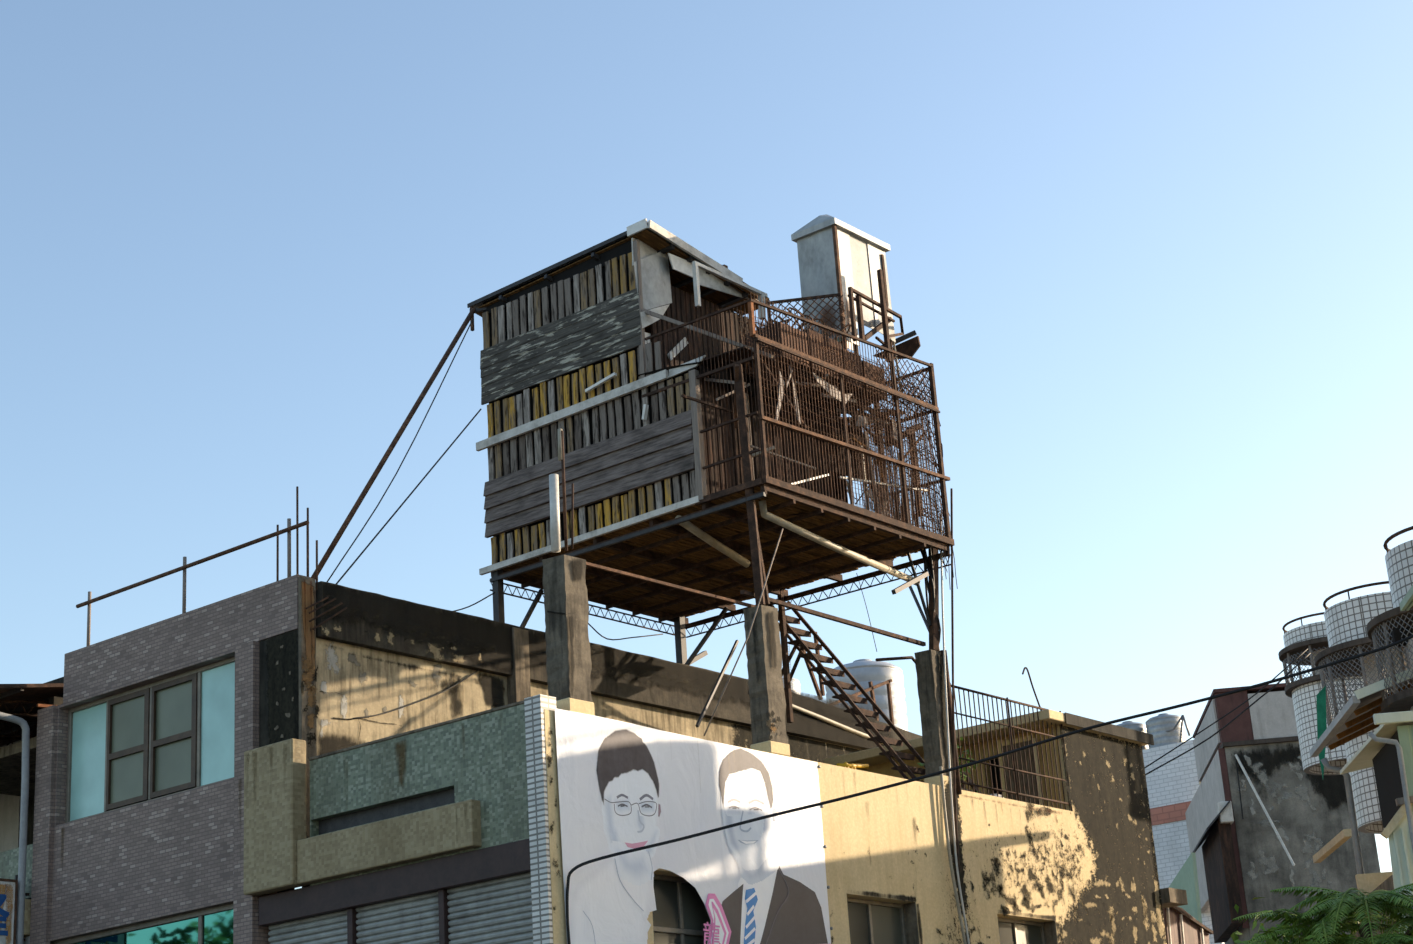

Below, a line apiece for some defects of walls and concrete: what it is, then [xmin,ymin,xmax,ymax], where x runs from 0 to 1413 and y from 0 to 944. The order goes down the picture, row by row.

corrosion [301,580,315,678]
water stain [266,582,547,745]
flaking render [411,640,482,663]
water stain [569,616,750,705]
water stain [320,735,365,755]
mould [1052,726,1167,944]